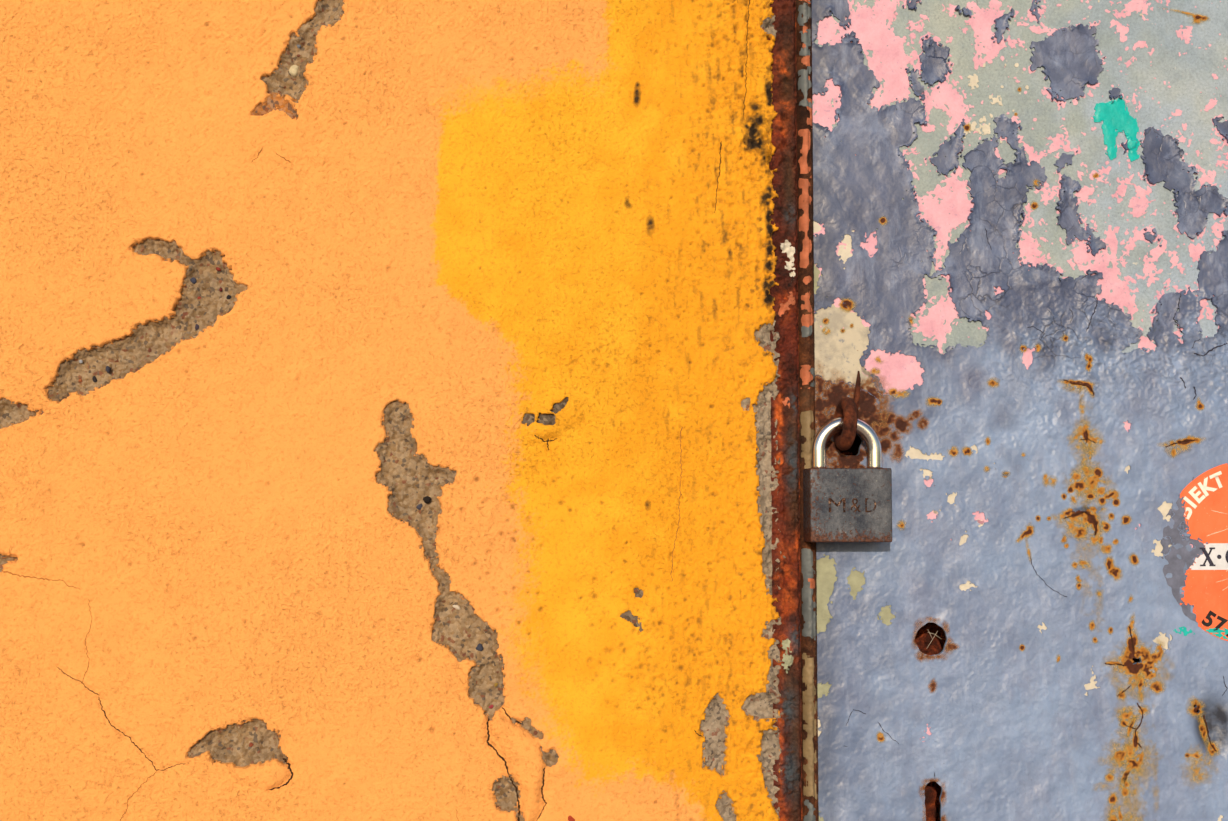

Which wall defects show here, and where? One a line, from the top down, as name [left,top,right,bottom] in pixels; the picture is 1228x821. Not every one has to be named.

spalling [250,0,345,120]
spalling [0,238,247,429]
corrosion [815,357,942,468]
peeling [741,0,1228,595]
corrosion [1017,353,1139,580]
crack [1,547,182,821]
spalling [187,718,288,767]
spalling [374,400,559,767]
spalling [700,548,865,821]
corrosion [1072,560,1090,589]
corrosion [1089,617,1164,821]
corrosion [1185,699,1218,781]